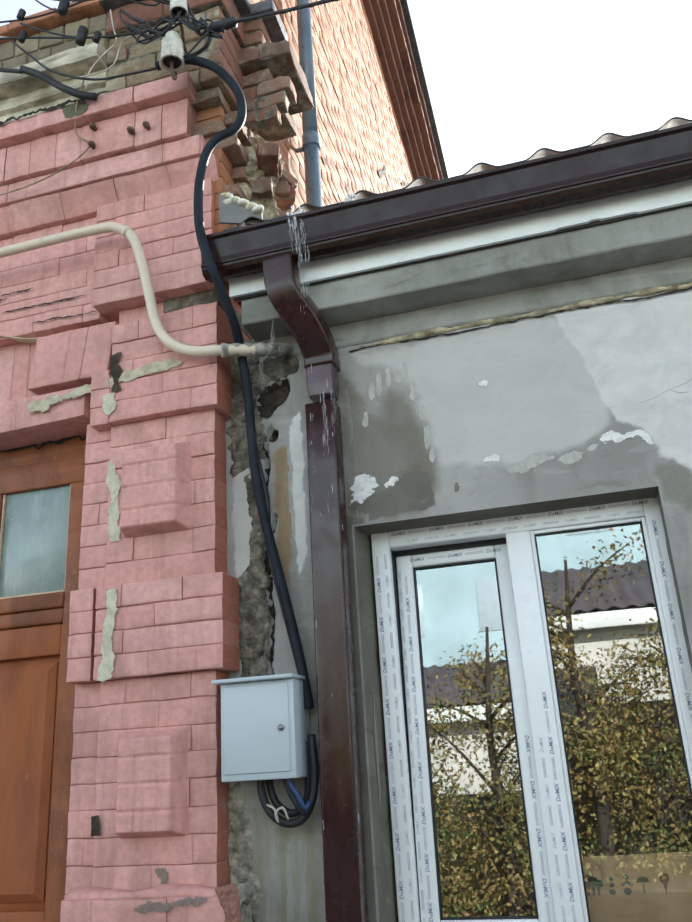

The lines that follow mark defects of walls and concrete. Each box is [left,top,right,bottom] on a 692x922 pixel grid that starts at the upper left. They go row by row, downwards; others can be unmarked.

crack [0,90,116,125]
spalling [236,132,298,220]
crack [0,287,96,324]
peeling [27,384,91,413]
peeling [102,352,182,415]
flaking render [483,429,654,474]
spalling [226,354,299,678]
flaking render [350,474,399,504]
water stain [642,451,692,529]
spalling [215,781,263,922]